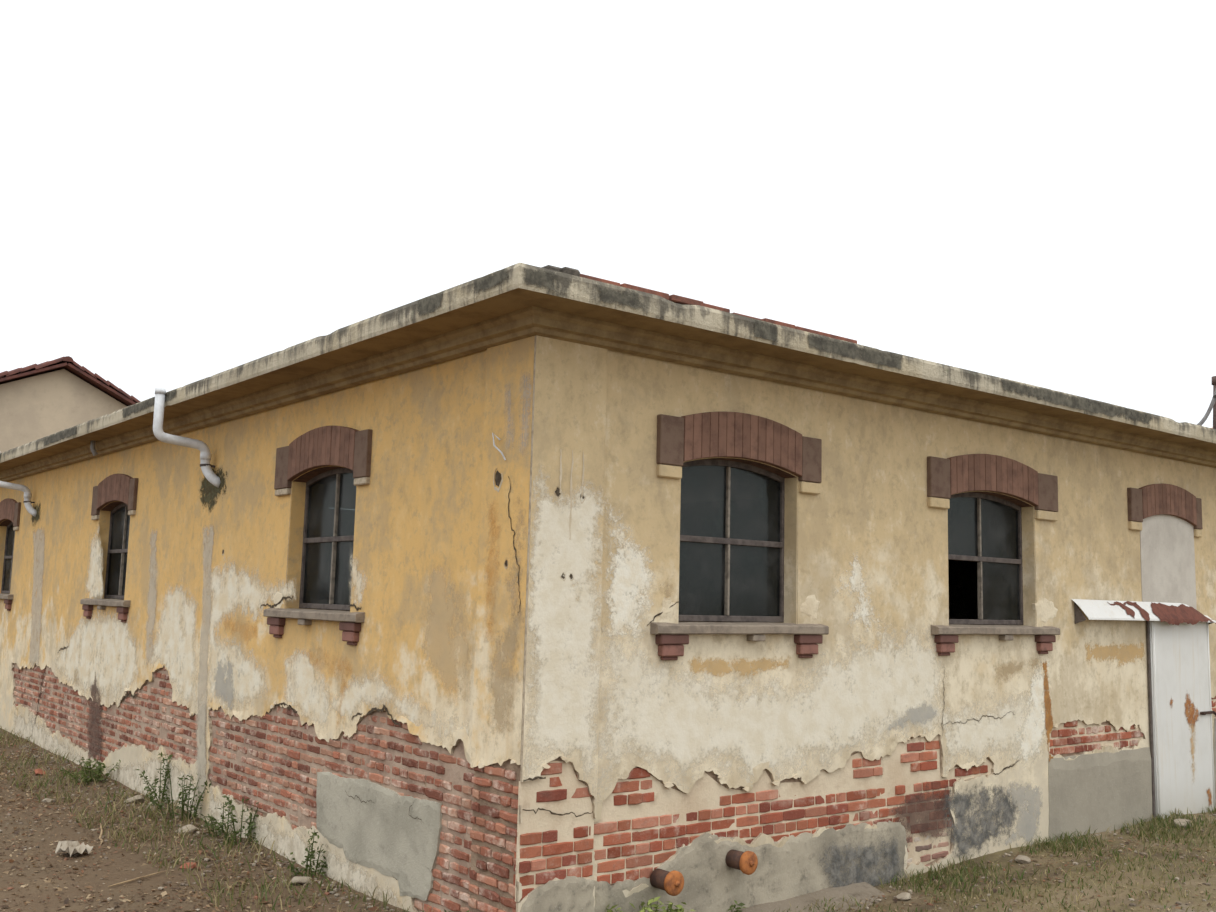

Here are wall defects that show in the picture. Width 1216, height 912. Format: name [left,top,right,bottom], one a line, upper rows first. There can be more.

crack [508,476,521,613]
corrosion [1107,601,1216,625]
leakage [14,526,397,905]
peeling [13,470,1144,912]
crack [942,671,1015,735]
corrosion [1170,694,1198,772]
leakage [944,783,1042,858]